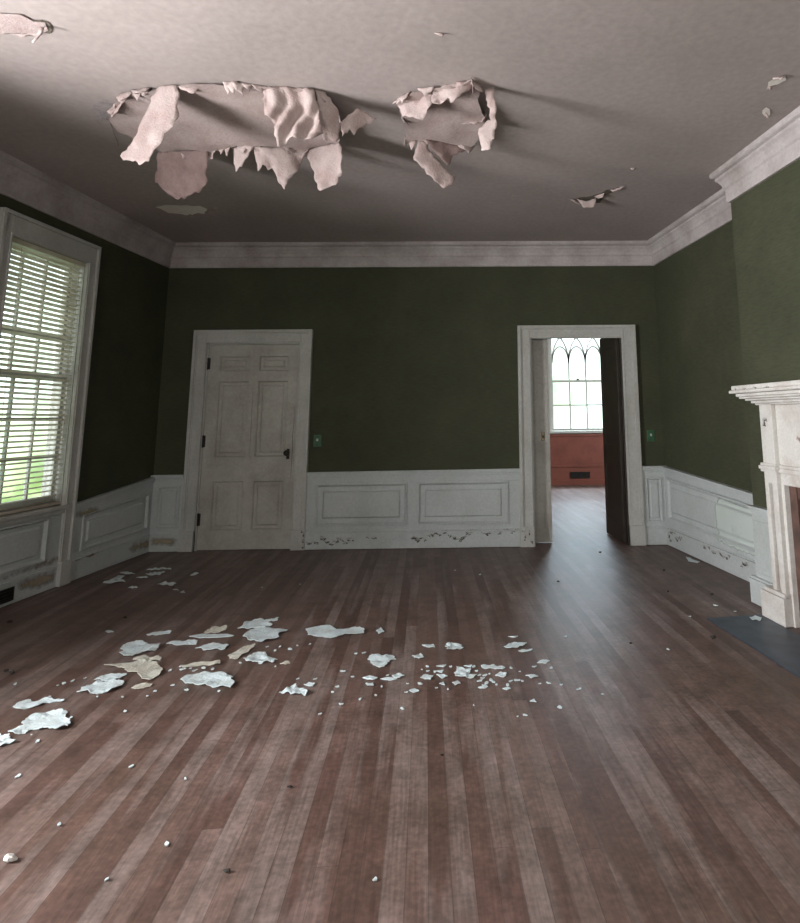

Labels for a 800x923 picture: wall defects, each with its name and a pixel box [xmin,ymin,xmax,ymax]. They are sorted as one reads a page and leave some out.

peeling [0,14,52,44]
peeling [393,76,497,188]
peeling [107,81,377,217]
peeling [570,186,625,208]
peeling [411,528,533,544]